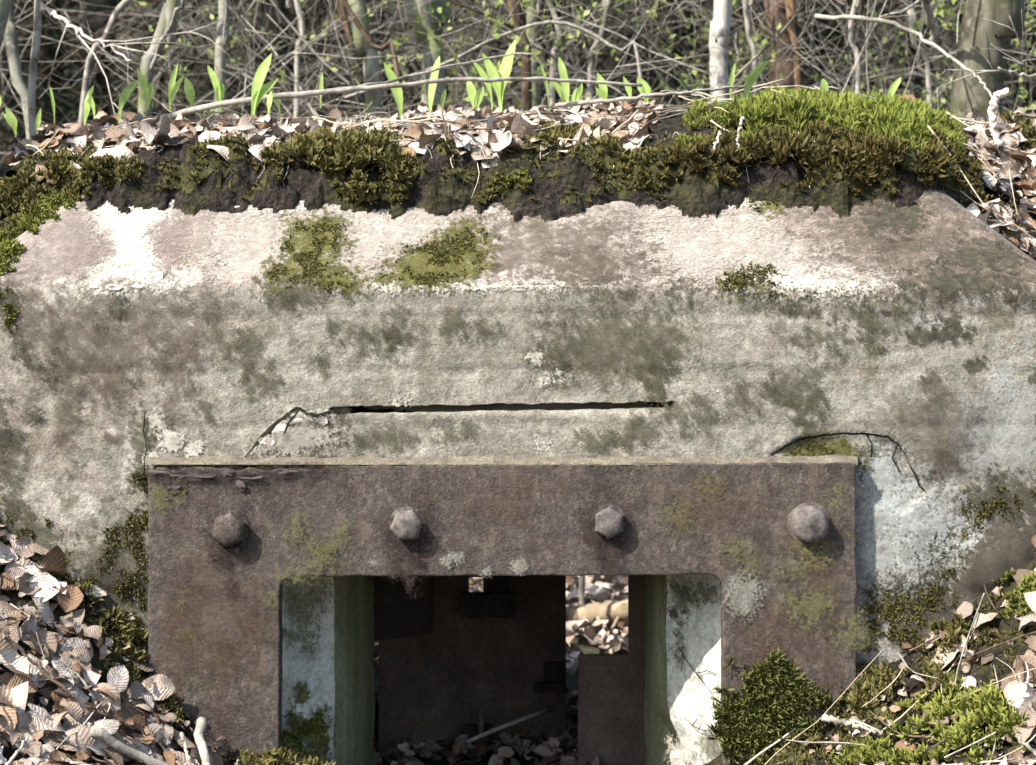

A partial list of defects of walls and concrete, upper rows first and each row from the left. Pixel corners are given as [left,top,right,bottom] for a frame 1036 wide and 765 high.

crack [245,406,416,457]
crack [646,400,672,408]
crack [771,432,927,493]
rust [371,498,441,593]
rust [575,501,639,596]